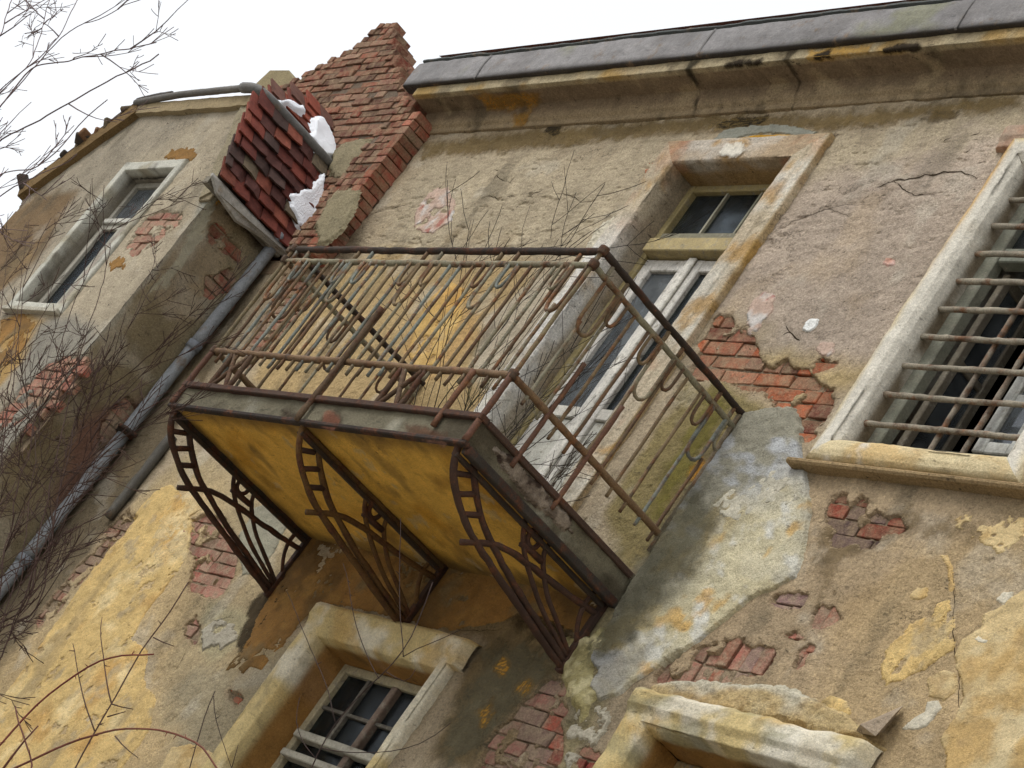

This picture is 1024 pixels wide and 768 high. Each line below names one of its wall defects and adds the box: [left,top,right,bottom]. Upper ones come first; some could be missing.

flaking render [109,212,200,272]
spalling [414,187,456,234]
crack [785,133,985,227]
flaking render [0,356,98,451]
flaking render [693,292,838,443]
flaking render [827,496,907,550]
peeling [0,485,287,768]
peeling [186,539,597,674]
leakage [589,486,714,656]
flaking render [657,638,776,684]
peeling [881,555,1024,768]
flaking render [481,680,612,768]